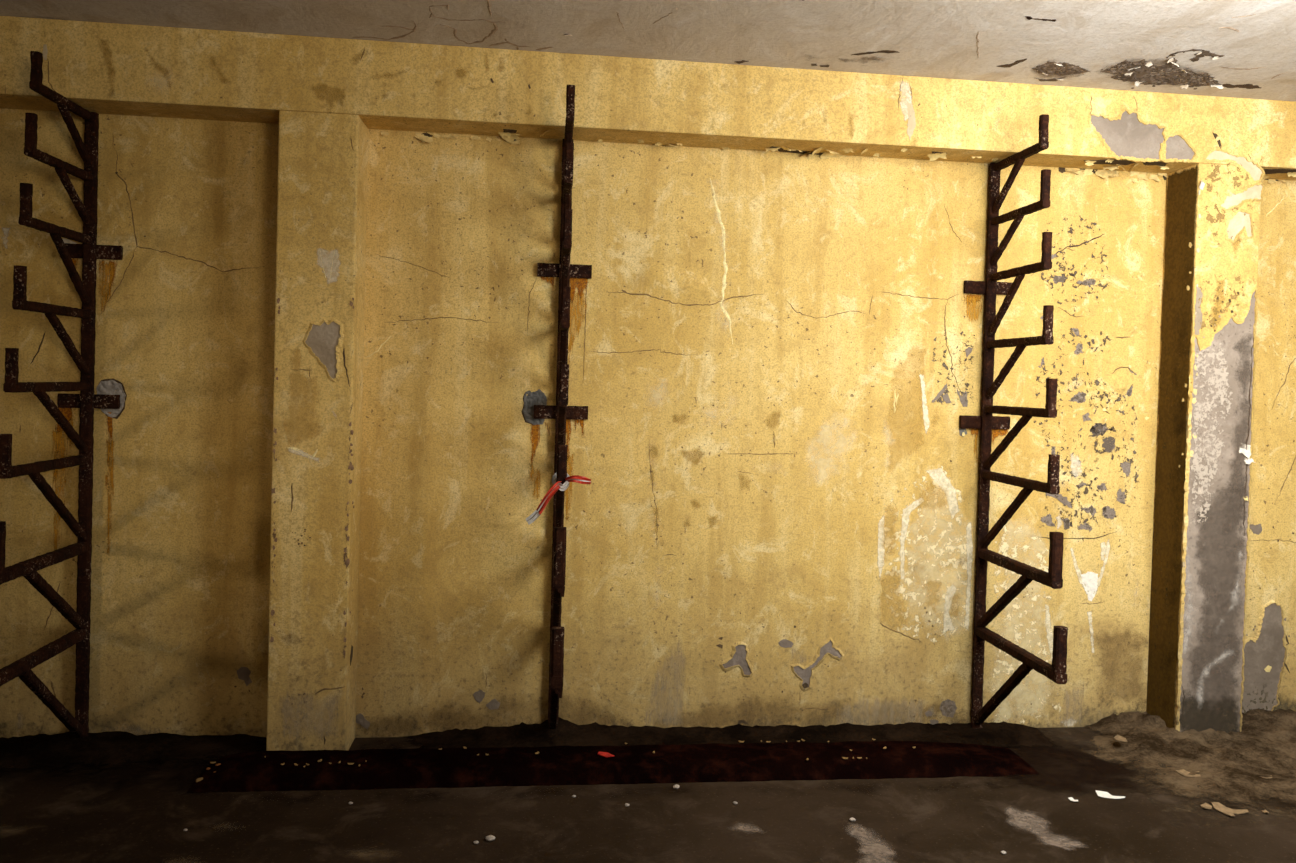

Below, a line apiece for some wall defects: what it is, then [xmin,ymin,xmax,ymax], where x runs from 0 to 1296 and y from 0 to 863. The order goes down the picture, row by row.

peeling [997,49,1296,252]
rust [568,278,588,380]
crack [591,348,696,356]
crack [608,179,962,396]
peeling [1034,217,1149,532]
rust [52,408,73,550]
rust [105,412,114,553]
peeling [302,318,354,587]
peeling [1176,248,1296,733]
peeling [717,637,758,677]
peeling [782,637,845,711]